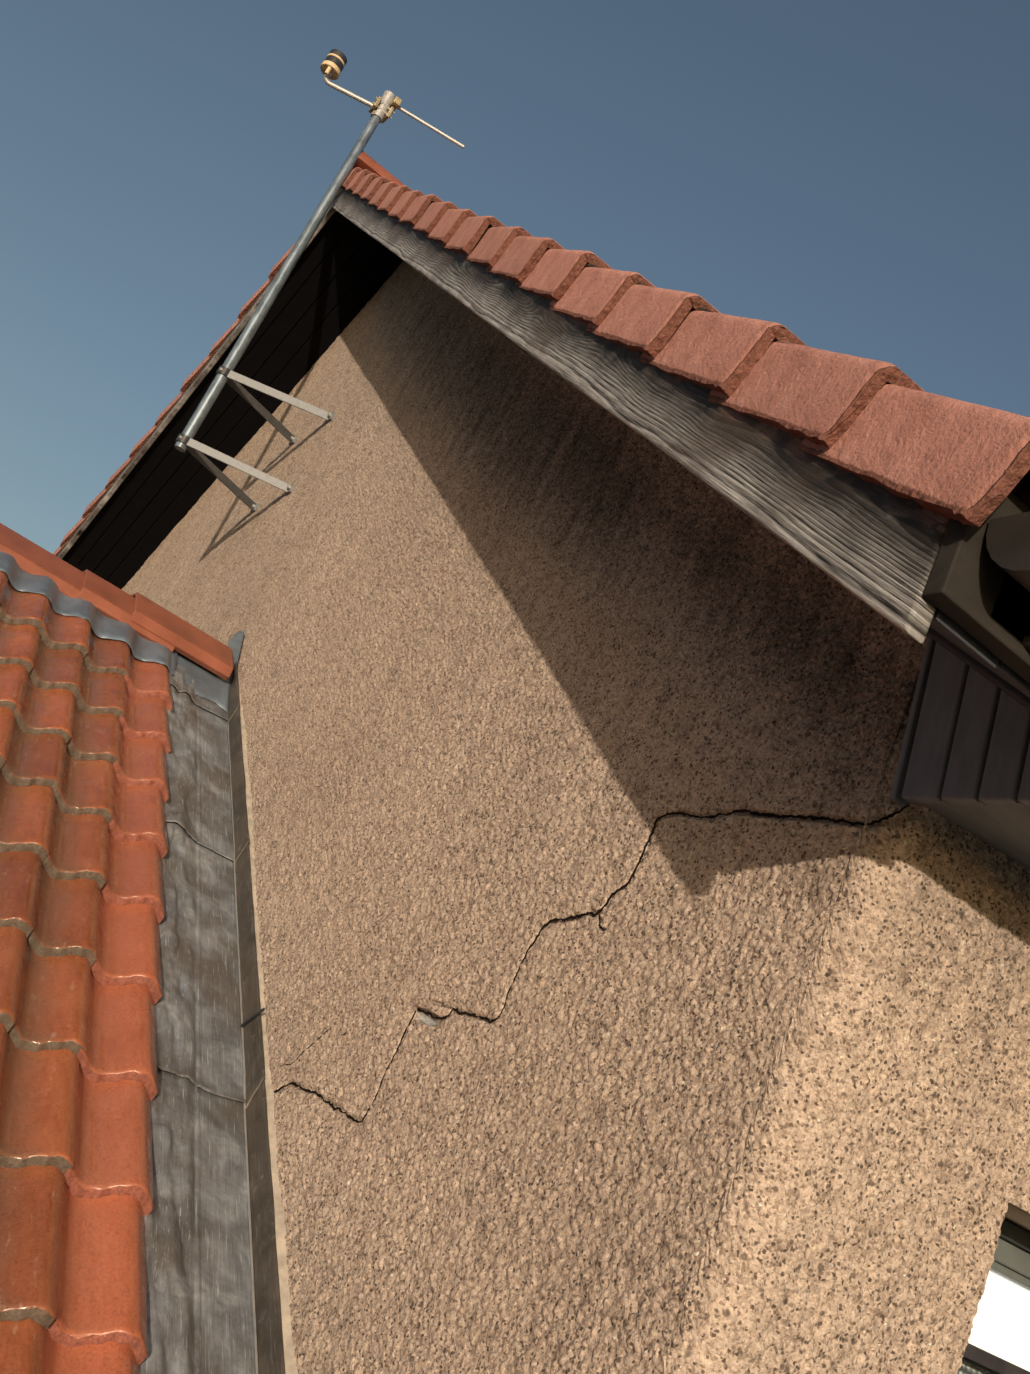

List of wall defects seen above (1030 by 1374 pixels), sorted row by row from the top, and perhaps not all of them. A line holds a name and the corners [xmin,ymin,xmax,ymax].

crack [273,804,910,1123]